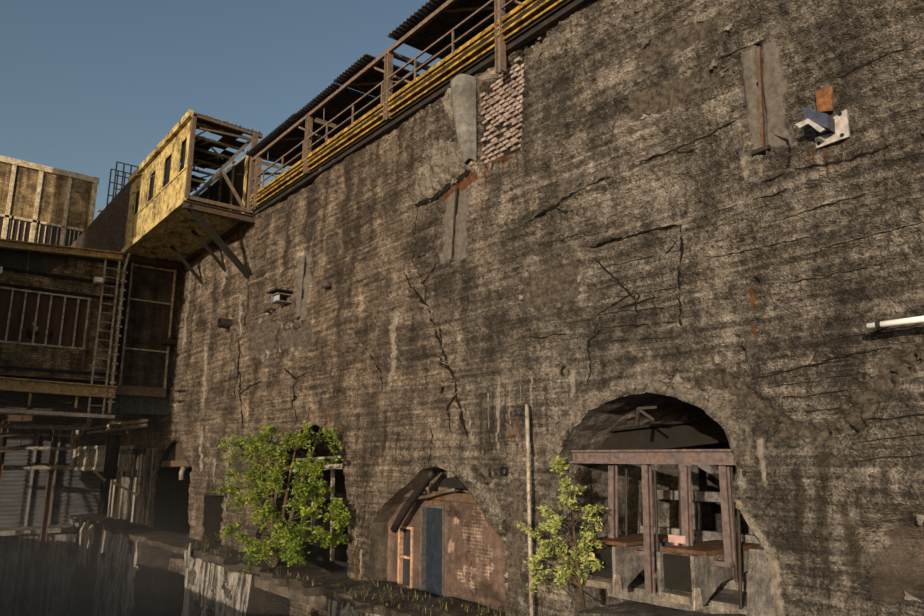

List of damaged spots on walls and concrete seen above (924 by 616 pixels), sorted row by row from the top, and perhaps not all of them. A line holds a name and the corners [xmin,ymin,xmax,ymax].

spalling [414,22,571,206]
crack [234,279,262,426]
crack [404,209,468,465]